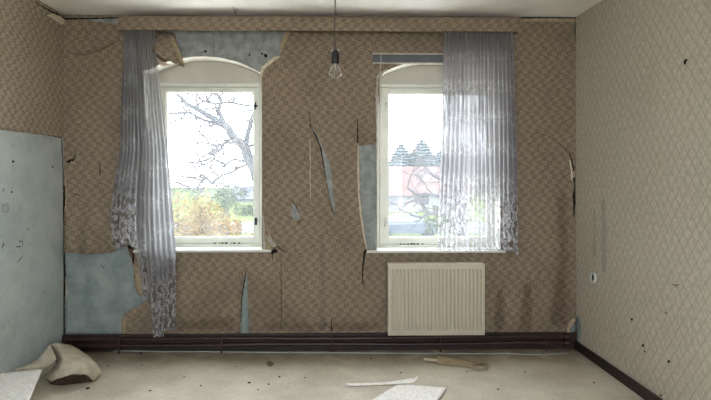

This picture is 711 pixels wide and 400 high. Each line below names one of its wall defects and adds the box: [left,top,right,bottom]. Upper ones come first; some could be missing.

peeling [152,30,291,93]
peeling [357,69,388,285]
peeling [63,205,150,334]